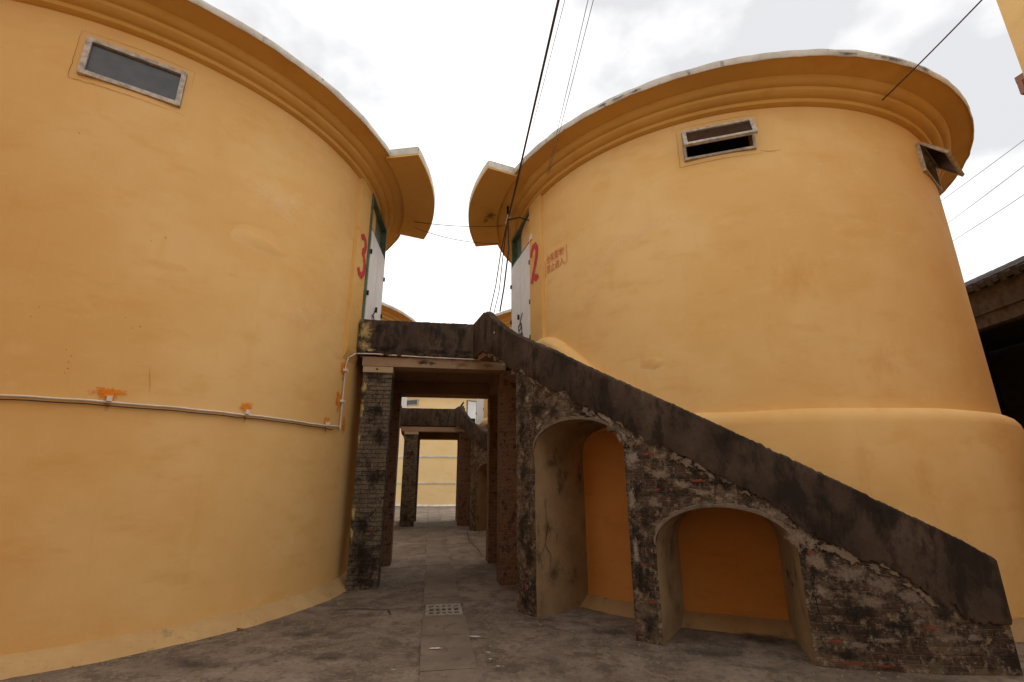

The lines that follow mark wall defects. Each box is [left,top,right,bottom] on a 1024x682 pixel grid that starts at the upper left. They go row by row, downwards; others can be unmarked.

leakage [601,415,670,466]
flaking render [648,452,751,507]
flaking render [759,506,940,609]